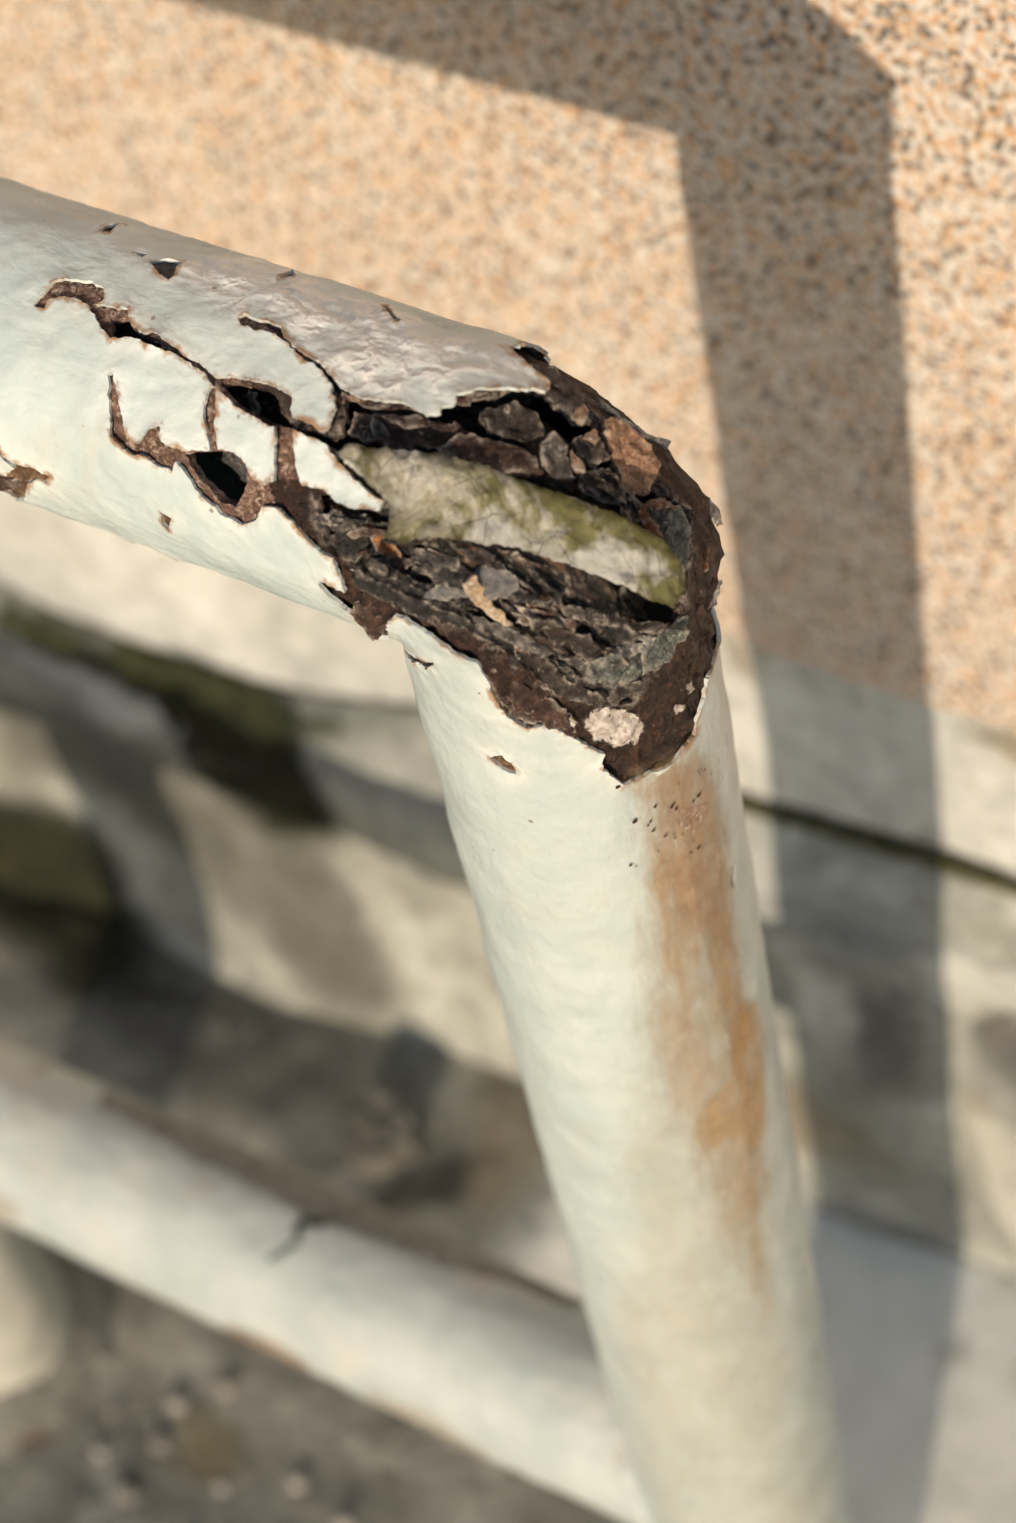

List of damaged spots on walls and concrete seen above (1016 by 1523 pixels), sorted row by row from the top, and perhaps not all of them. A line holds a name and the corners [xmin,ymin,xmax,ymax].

peeling [141,256,178,279]
peeling [293,430,385,511]
rust [175,347,725,789]